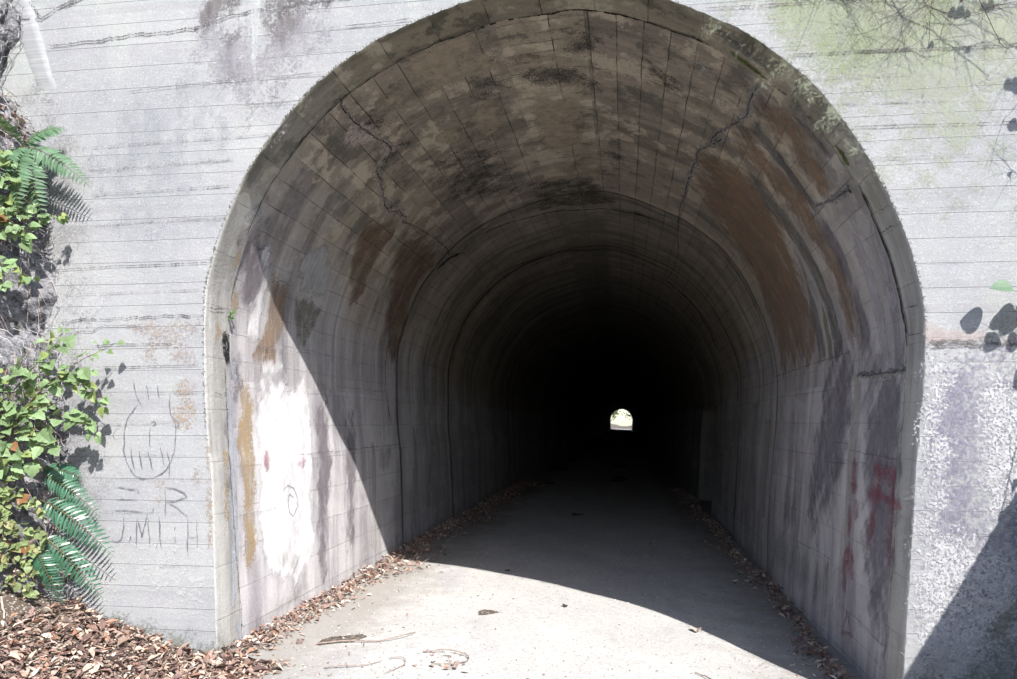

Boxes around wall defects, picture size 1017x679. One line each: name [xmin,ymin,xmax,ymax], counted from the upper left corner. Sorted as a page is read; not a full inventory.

crack [49,0,330,46]
damp [194,0,334,118]
crack [129,18,413,92]
damp [465,65,602,99]
crack [709,0,853,8]
damp [426,138,632,210]
rust [352,225,394,299]
rust [388,240,433,361]
crack [247,9,1017,674]
rust [743,135,855,332]
damp [750,171,900,620]
rust [237,383,261,569]